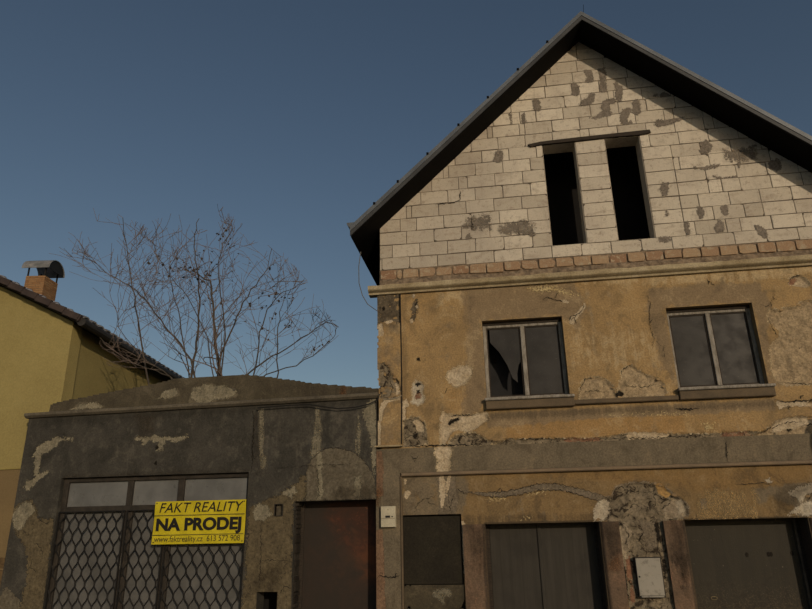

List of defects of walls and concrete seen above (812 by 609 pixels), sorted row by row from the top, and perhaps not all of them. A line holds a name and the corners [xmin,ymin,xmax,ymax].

spalling [766,299,812,387]
spalling [157,388,178,400]
spalling [190,384,237,403]
peeling [0,434,74,609]
peeling [135,434,189,452]
damp [258,409,267,469]
damp [311,407,324,501]
crack [458,482,613,504]
spalling [362,362,812,517]
spalling [593,480,691,609]